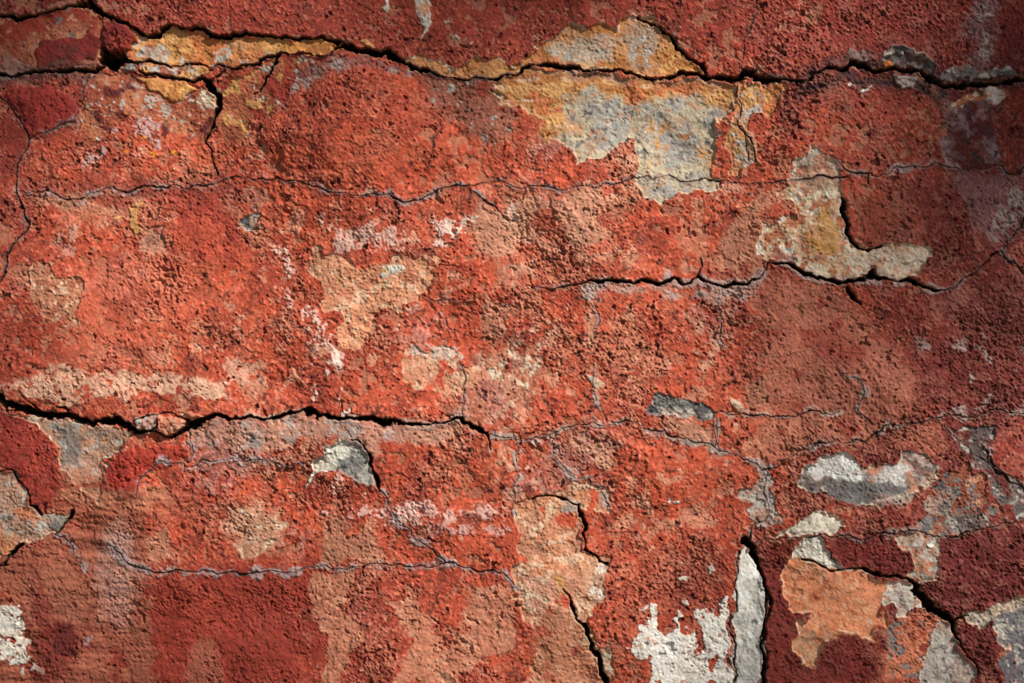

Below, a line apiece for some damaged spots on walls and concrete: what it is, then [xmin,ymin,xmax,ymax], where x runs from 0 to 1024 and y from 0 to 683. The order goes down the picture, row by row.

flaking render [0,7,336,149]
peeling [406,0,789,205]
crack [0,0,1024,349]
peeling [755,144,934,279]
flaking render [306,440,375,486]
crack [0,294,1024,683]
flaking render [647,391,715,423]
peeling [731,547,765,683]
peeling [735,425,1024,667]
flaking render [963,596,1024,683]